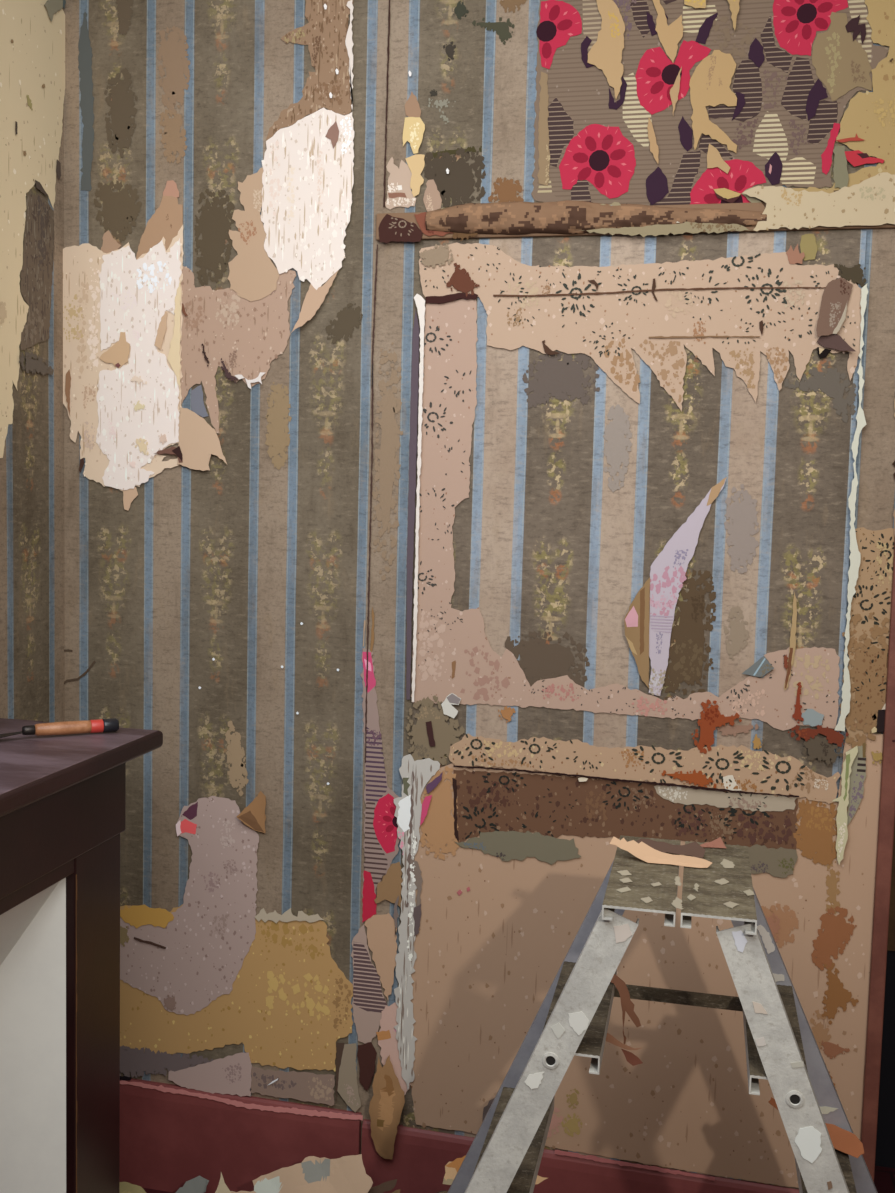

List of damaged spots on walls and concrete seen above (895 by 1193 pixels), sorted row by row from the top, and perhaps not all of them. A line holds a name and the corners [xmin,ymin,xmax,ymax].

flaking render [261,92,354,290]
flaking render [0,0,65,458]
flaking render [96,238,182,490]
flaking render [441,693,461,718]
corrosion [691,699,759,754]
corrosion [788,682,849,747]
flaking render [120,904,183,929]
leakage [761,903,799,948]
flaking render [120,918,353,1085]